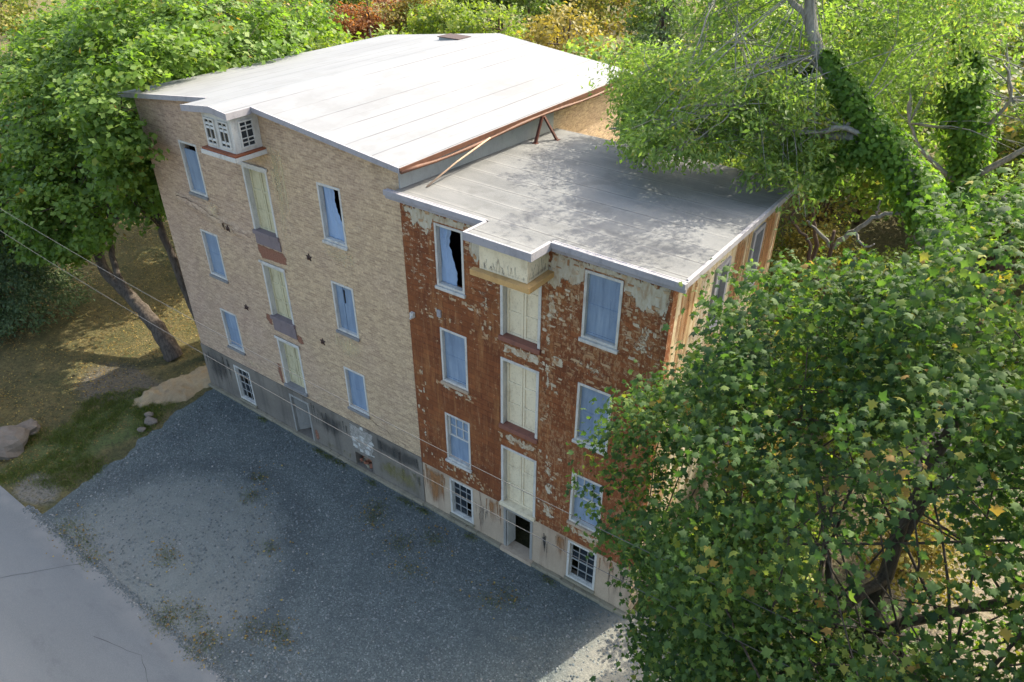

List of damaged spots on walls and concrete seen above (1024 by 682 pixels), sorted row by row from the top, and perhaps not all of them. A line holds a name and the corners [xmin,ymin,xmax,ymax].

peeling [402,204,479,262]
peeling [421,253,671,421]
peeling [349,423,374,457]
water stain [378,442,420,485]
peeling [416,366,492,494]
peeling [498,431,598,547]